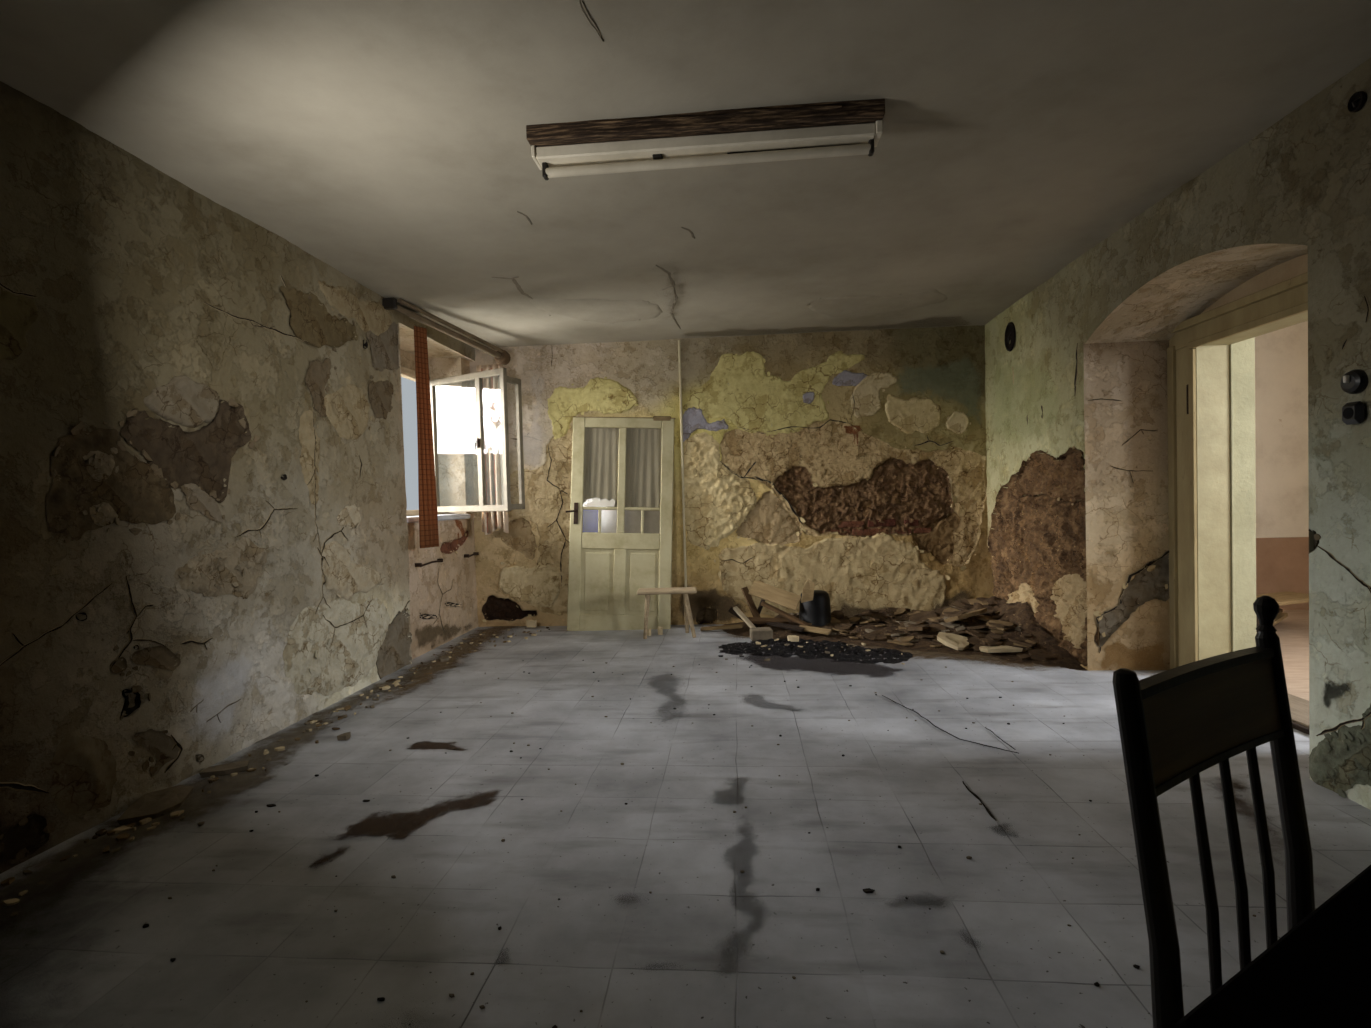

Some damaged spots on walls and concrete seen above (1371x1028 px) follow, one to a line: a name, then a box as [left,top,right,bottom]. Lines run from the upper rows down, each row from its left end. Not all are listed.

crack [579,0,604,41]
crack [0,576,213,668]
flaking render [45,375,260,543]
flaking render [280,283,400,505]
crack [236,404,453,643]
flaking render [283,598,460,696]
flaking render [482,377,638,622]
flaking render [681,351,1170,667]
flaking render [1309,705,1371,798]
crack [1316,542,1371,593]
crack [1316,712,1371,736]
leakage [709,777,774,979]